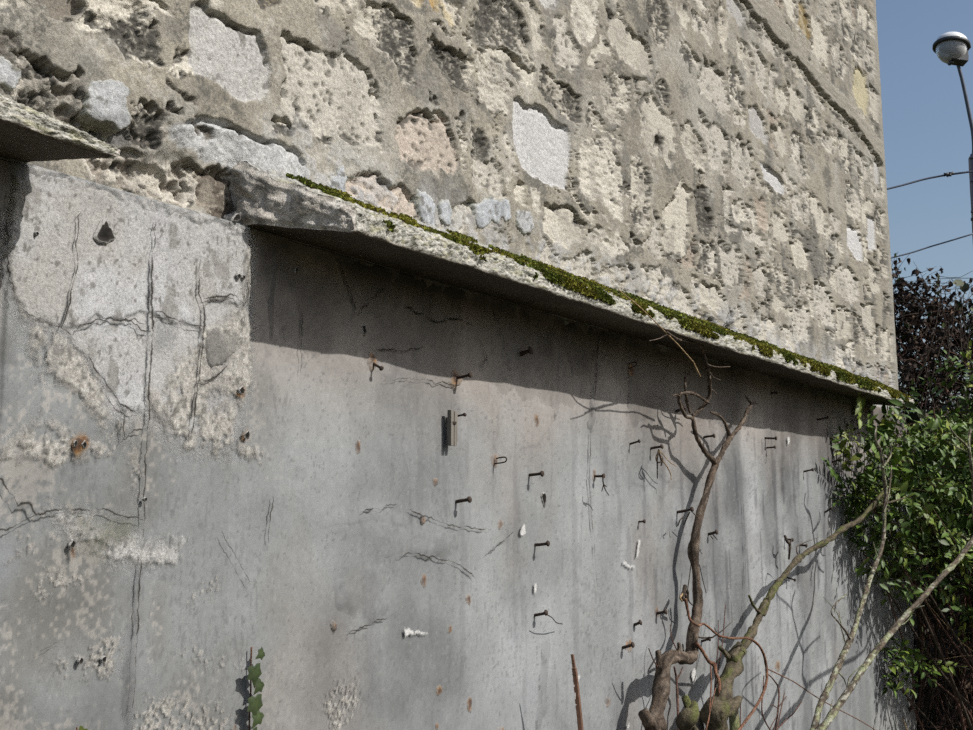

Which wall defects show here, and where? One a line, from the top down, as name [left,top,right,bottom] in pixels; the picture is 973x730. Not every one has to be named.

leakage [4,220,256,451]
peeling [1,163,264,467]
crack [0,195,253,708]
leakage [826,410,843,506]
crack [393,552,475,578]
crack [363,504,513,555]
leakage [535,632,551,730]
leakage [822,680,851,730]